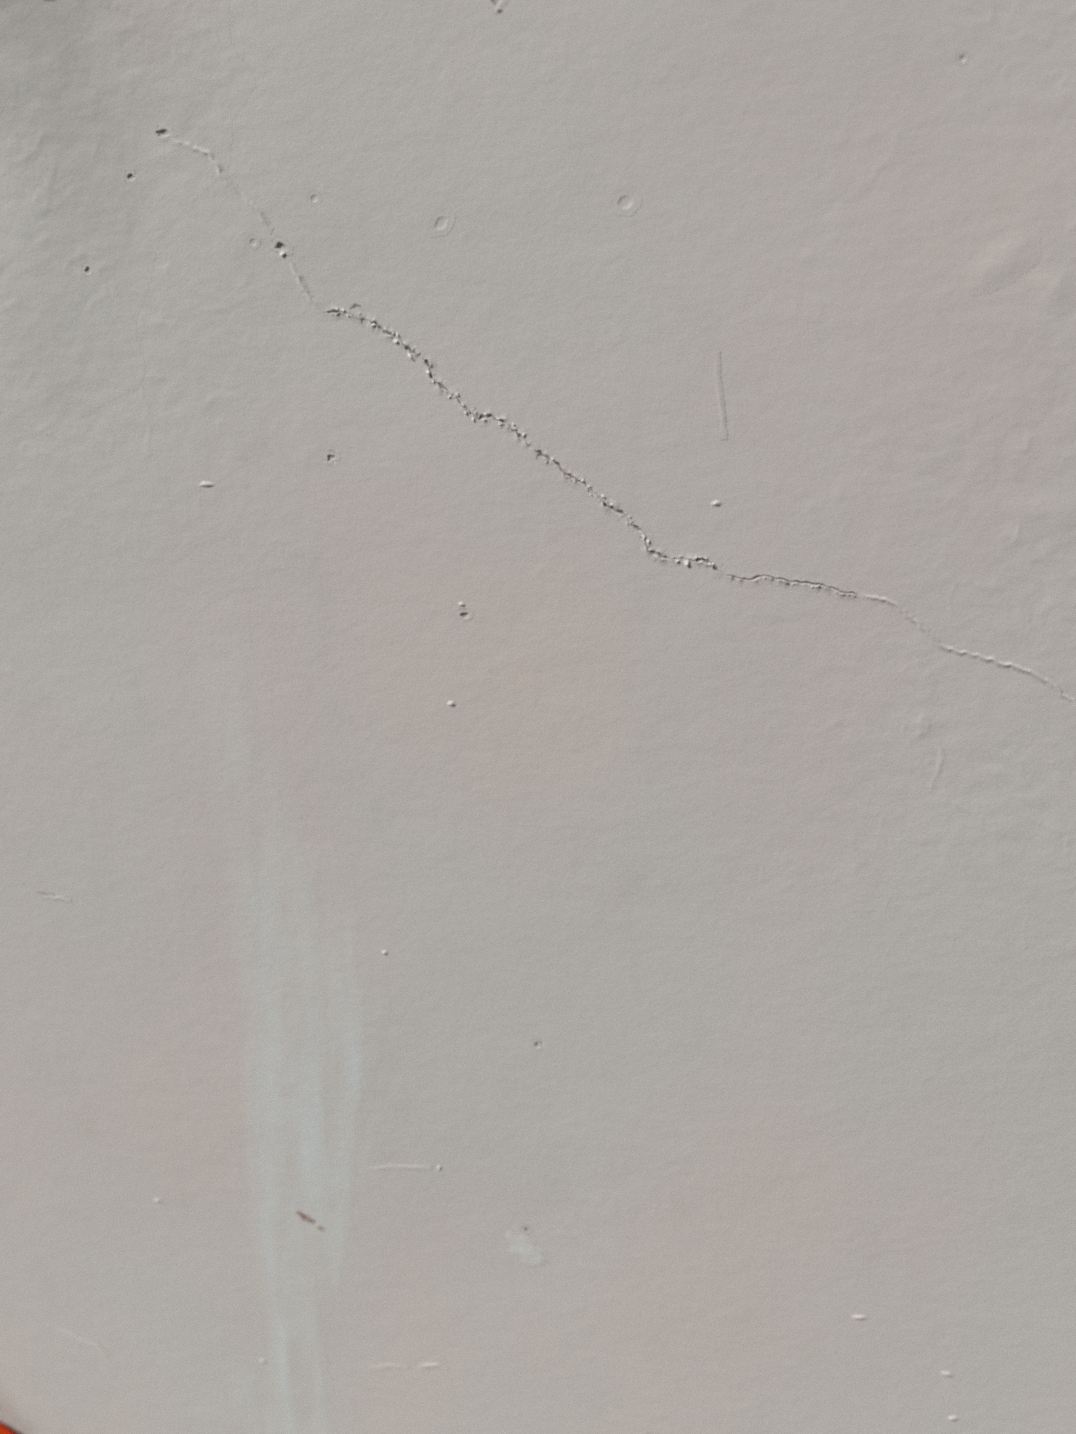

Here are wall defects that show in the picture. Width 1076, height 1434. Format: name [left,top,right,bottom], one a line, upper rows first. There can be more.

crack [169,136,1076,709]